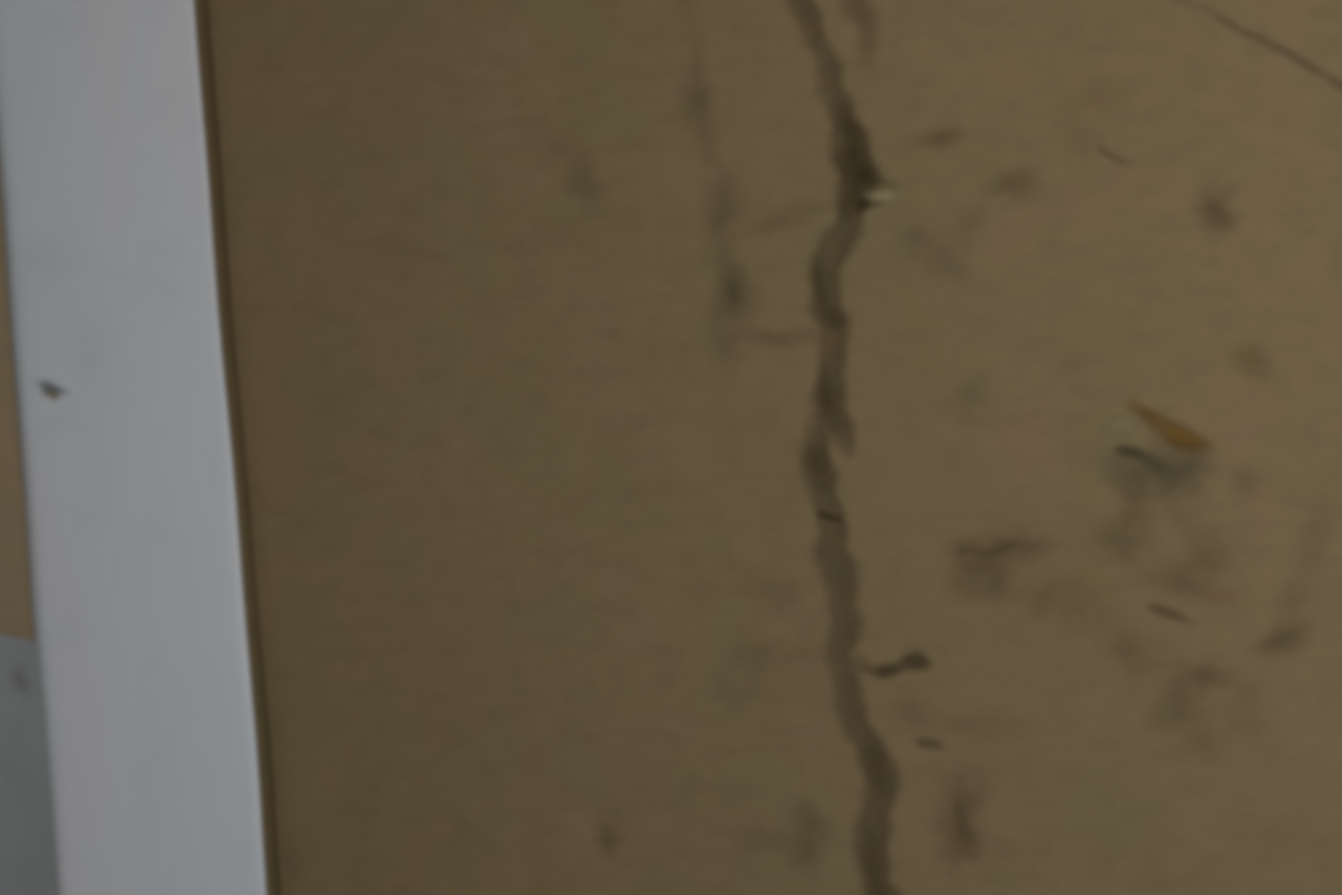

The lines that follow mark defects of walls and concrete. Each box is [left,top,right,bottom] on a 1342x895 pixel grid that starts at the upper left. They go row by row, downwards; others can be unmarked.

crack [793,0,929,895]